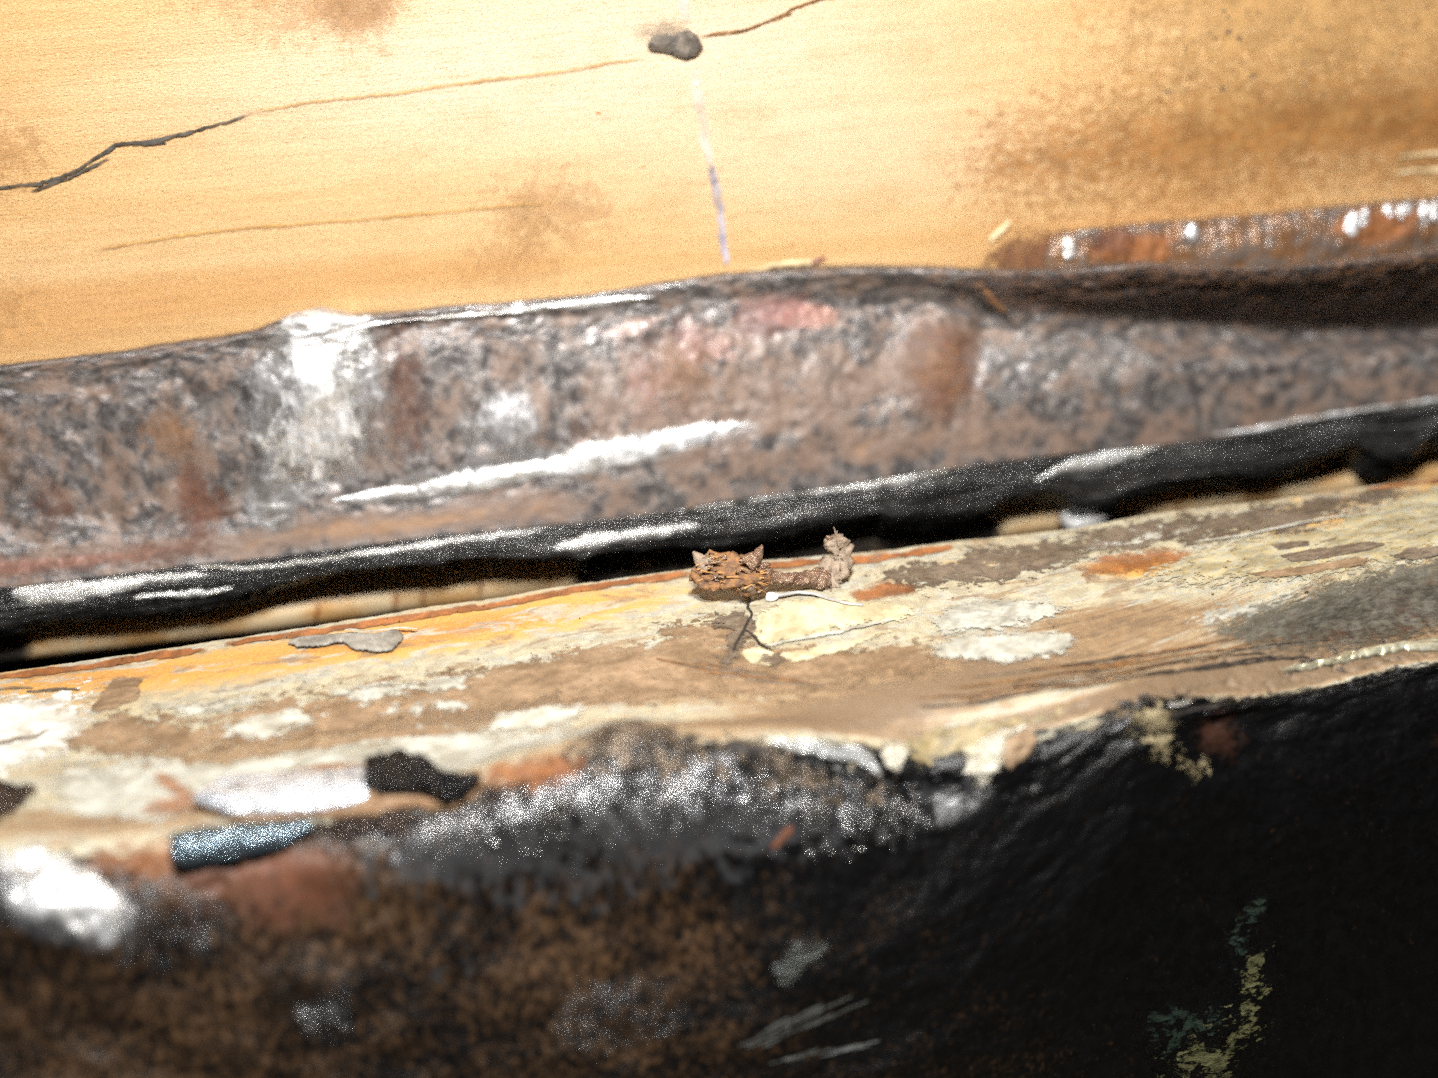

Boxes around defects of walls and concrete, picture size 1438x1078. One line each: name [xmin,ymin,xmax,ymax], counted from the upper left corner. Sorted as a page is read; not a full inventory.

crack [703,0,818,37]
crack [585,59,632,68]
crack [0,72,548,191]
water stain [963,10,1438,226]
rust [1369,478,1438,489]
rust [0,535,211,585]
peeling [0,485,1438,872]